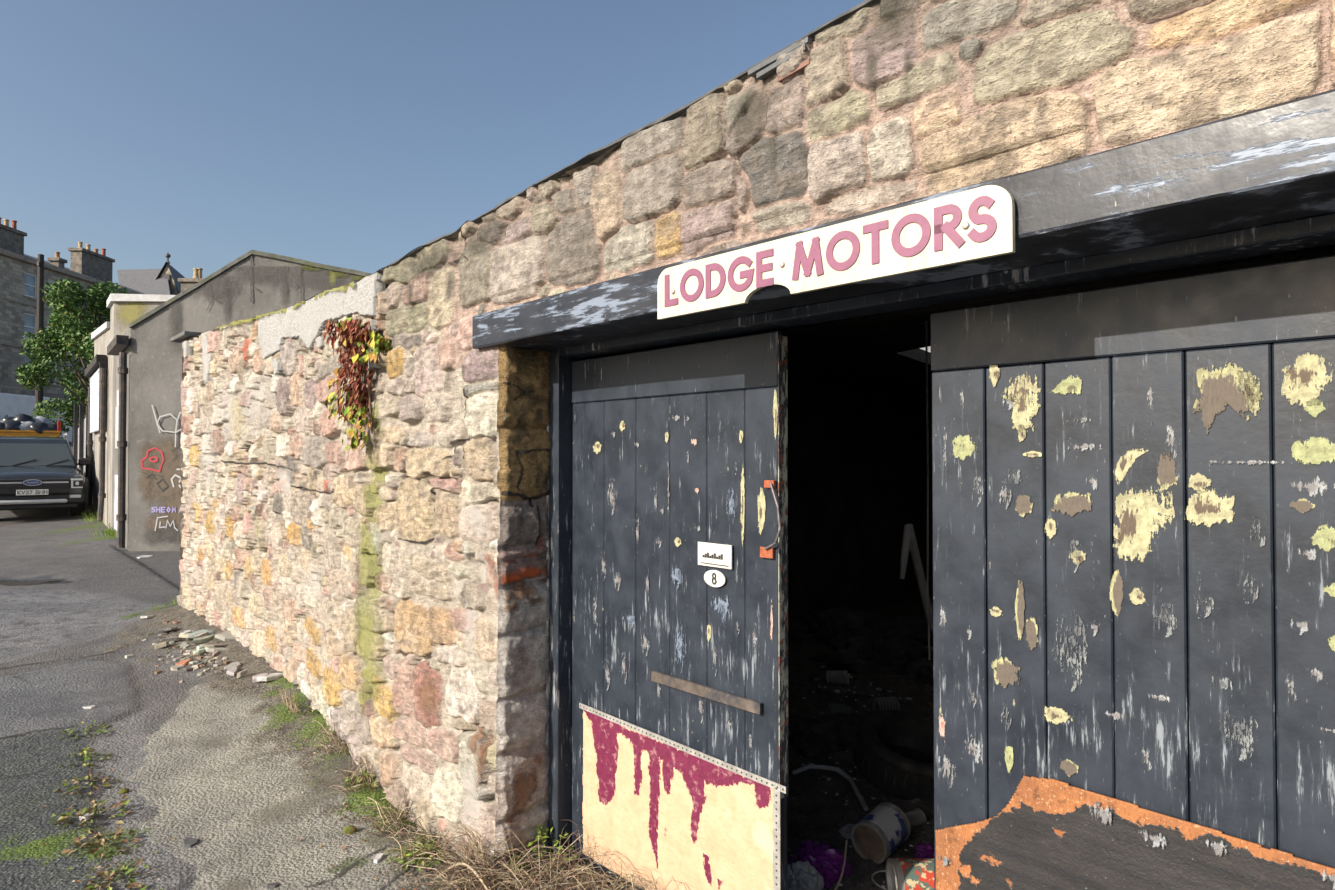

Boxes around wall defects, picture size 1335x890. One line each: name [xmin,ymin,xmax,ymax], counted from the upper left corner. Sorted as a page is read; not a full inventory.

flaking render [258,272,385,376]
peeling [943,414,977,465]
peeling [989,365,1082,517]
peeling [1193,362,1263,434]
peeling [1281,352,1333,418]
crack [501,449,550,544]
peeling [1045,477,1097,539]
peeling [1109,423,1335,637]
peeling [989,580,1098,692]
peeling [992,657,1021,773]
peeling [1044,706,1073,725]
peeling [1220,704,1258,761]